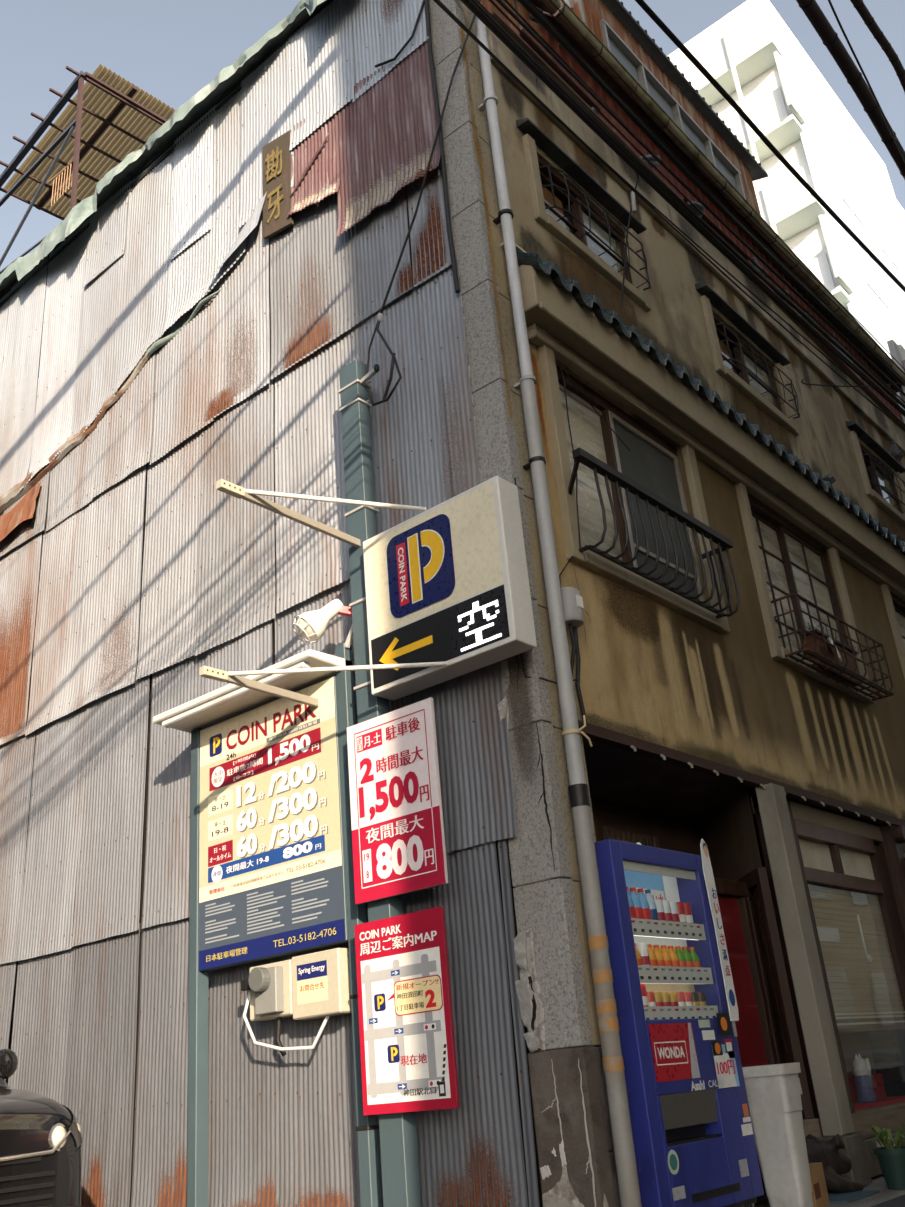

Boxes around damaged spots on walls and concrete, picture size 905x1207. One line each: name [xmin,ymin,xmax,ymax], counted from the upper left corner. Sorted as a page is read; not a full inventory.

corrosion [393,156,448,296]
corrosion [203,293,261,421]
corrosion [281,240,342,372]
corrosion [0,572,34,738]
damp [579,576,905,820]
spalling [513,928,545,1052]
corrosion [81,1140,109,1207]
corrosion [224,1173,356,1207]
corrosion [428,1119,519,1207]
crack [544,1058,596,1207]